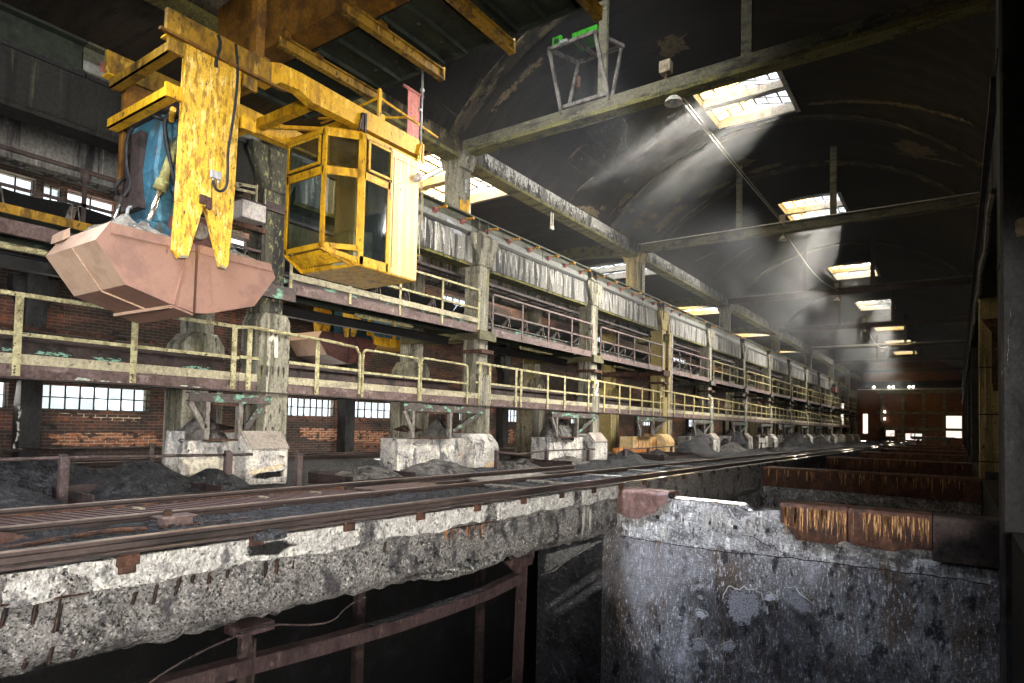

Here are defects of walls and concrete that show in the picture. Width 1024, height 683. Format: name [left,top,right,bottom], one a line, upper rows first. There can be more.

spalling [444,521,494,541]
corrosion [784,506,929,543]
spalling [248,540,296,578]
spalling [173,572,211,596]
spalling [0,604,10,629]
spalling [30,604,39,625]
spalling [47,592,89,664]